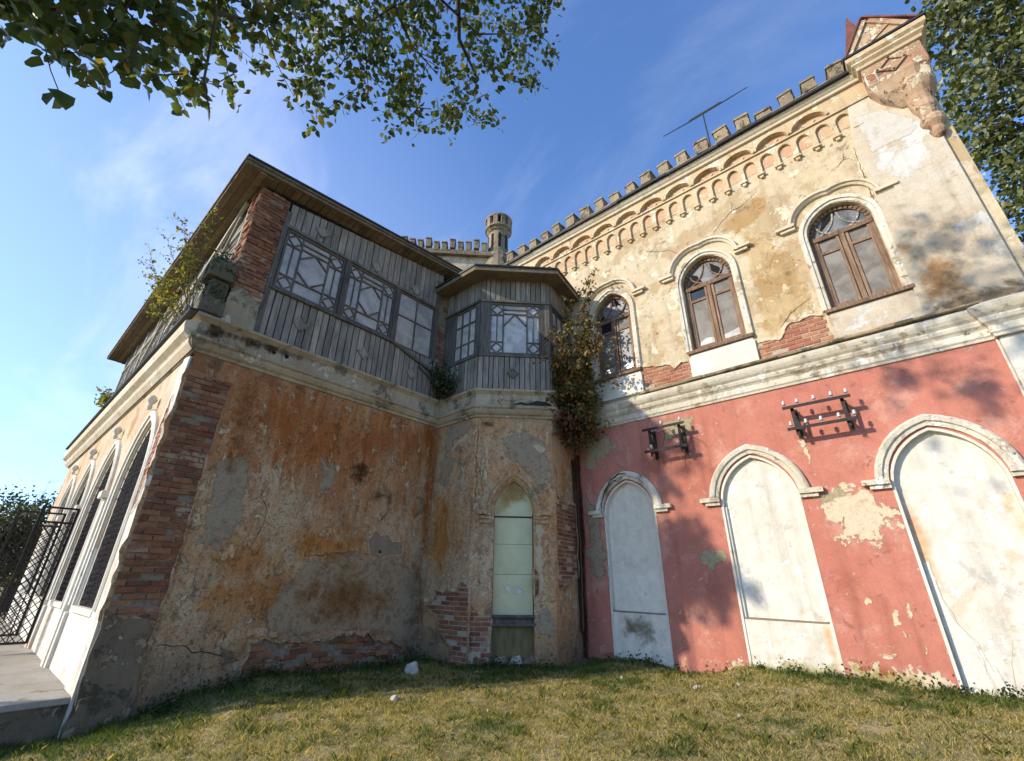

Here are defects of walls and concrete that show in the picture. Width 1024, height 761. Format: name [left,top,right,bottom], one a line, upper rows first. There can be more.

flaking render [855,110,916,153]
flaking render [756,312,835,359]
flaking render [641,359,692,390]
flaking render [583,435,617,480]
flaking render [98,368,233,625]
peeling [809,482,906,549]
flaking render [534,490,607,594]
damp [571,443,672,658]
flaking render [698,550,727,570]
flaking render [230,528,493,682]
crack [157,632,244,674]